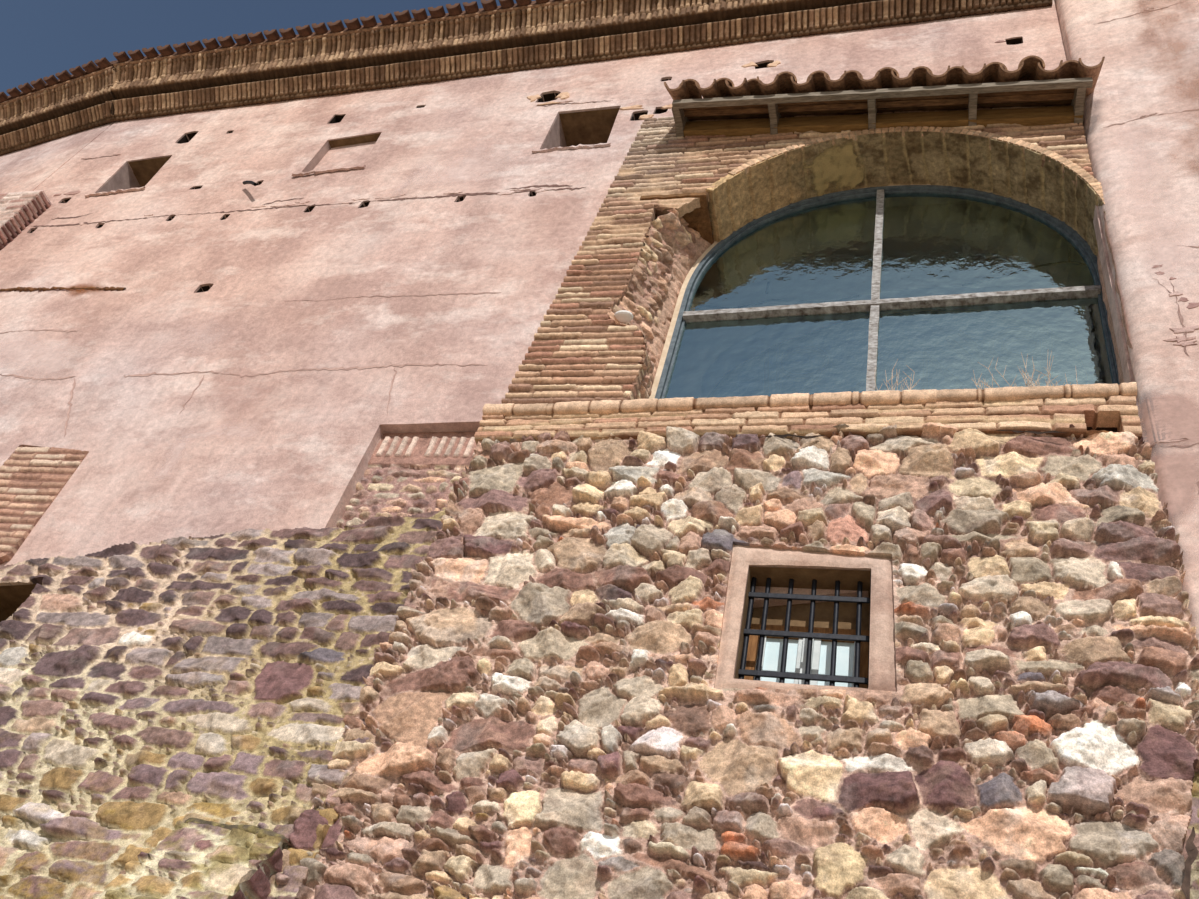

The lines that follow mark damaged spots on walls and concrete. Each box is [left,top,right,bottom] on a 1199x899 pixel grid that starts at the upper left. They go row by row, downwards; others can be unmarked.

crack [1107,109,1199,127]
crack [0,286,126,294]
crack [2,327,75,335]
crack [1153,278,1199,356]
crack [0,374,76,436]
crack [124,363,480,415]
crack [1150,438,1197,451]
crack [1181,827,1199,899]